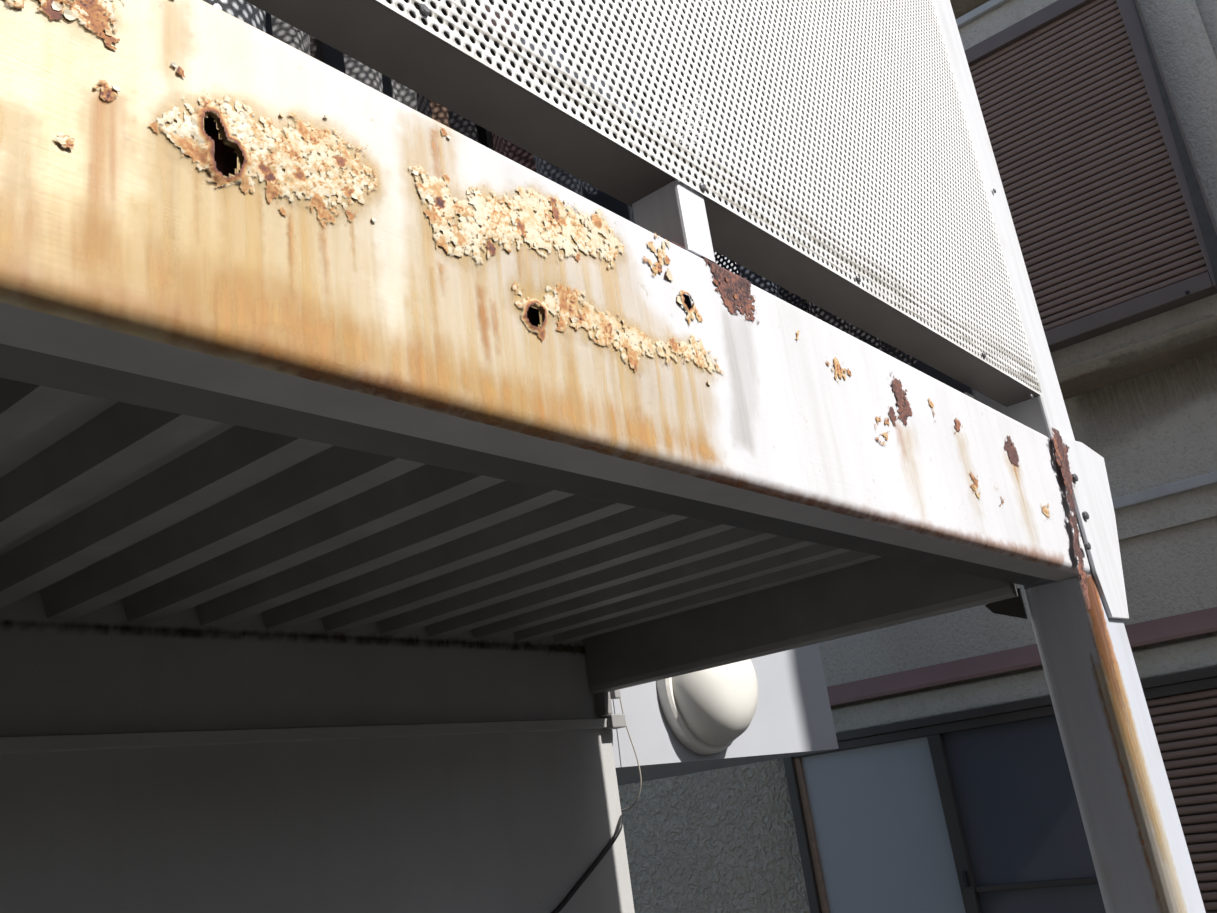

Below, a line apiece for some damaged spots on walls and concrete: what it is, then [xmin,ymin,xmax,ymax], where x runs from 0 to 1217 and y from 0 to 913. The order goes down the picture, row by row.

peeling [6,0,126,50]
rust [92,80,121,199]
peeling [148,94,378,244]
peeling [409,165,625,273]
rust [514,224,566,300]
rust [583,249,623,329]
peeling [512,233,724,386]
rust [701,257,759,325]
rust [217,316,1060,566]
rust [1080,576,1184,913]